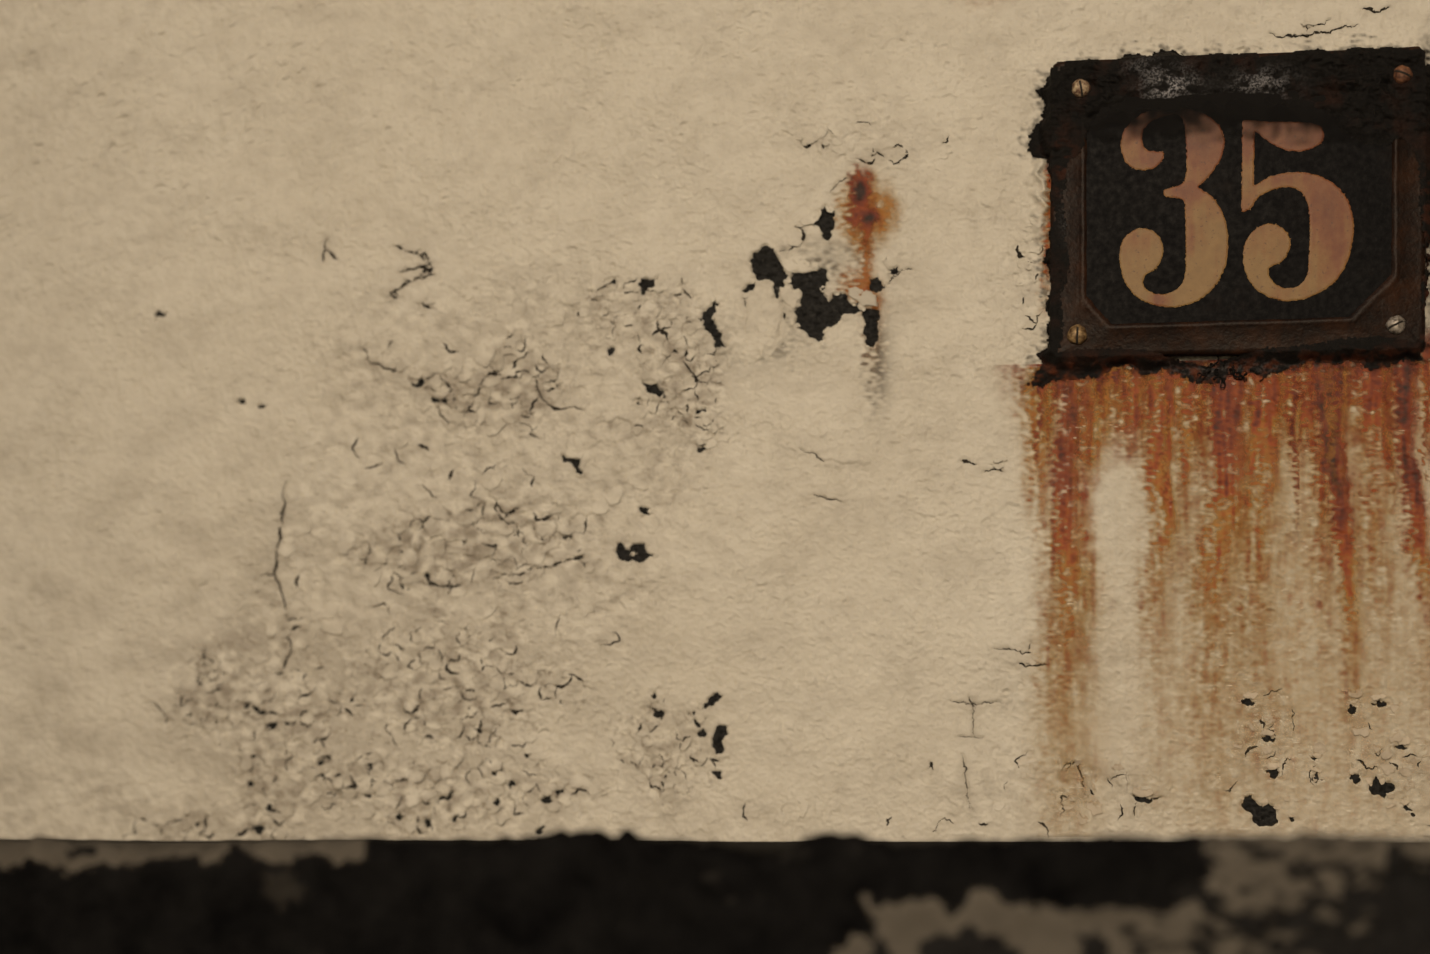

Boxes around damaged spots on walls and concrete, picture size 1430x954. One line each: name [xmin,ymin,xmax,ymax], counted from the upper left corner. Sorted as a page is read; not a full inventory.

crack [390,239,435,309]
peeling [799,203,835,241]
peeling [742,246,902,351]
rust [835,169,896,311]
rust [1041,166,1051,288]
crack [486,339,578,438]
crack [261,482,303,675]
crack [366,503,589,623]
rust [1014,334,1430,689]
peeling [1233,688,1291,779]
peeling [1348,685,1430,817]
peeling [833,781,1430,954]